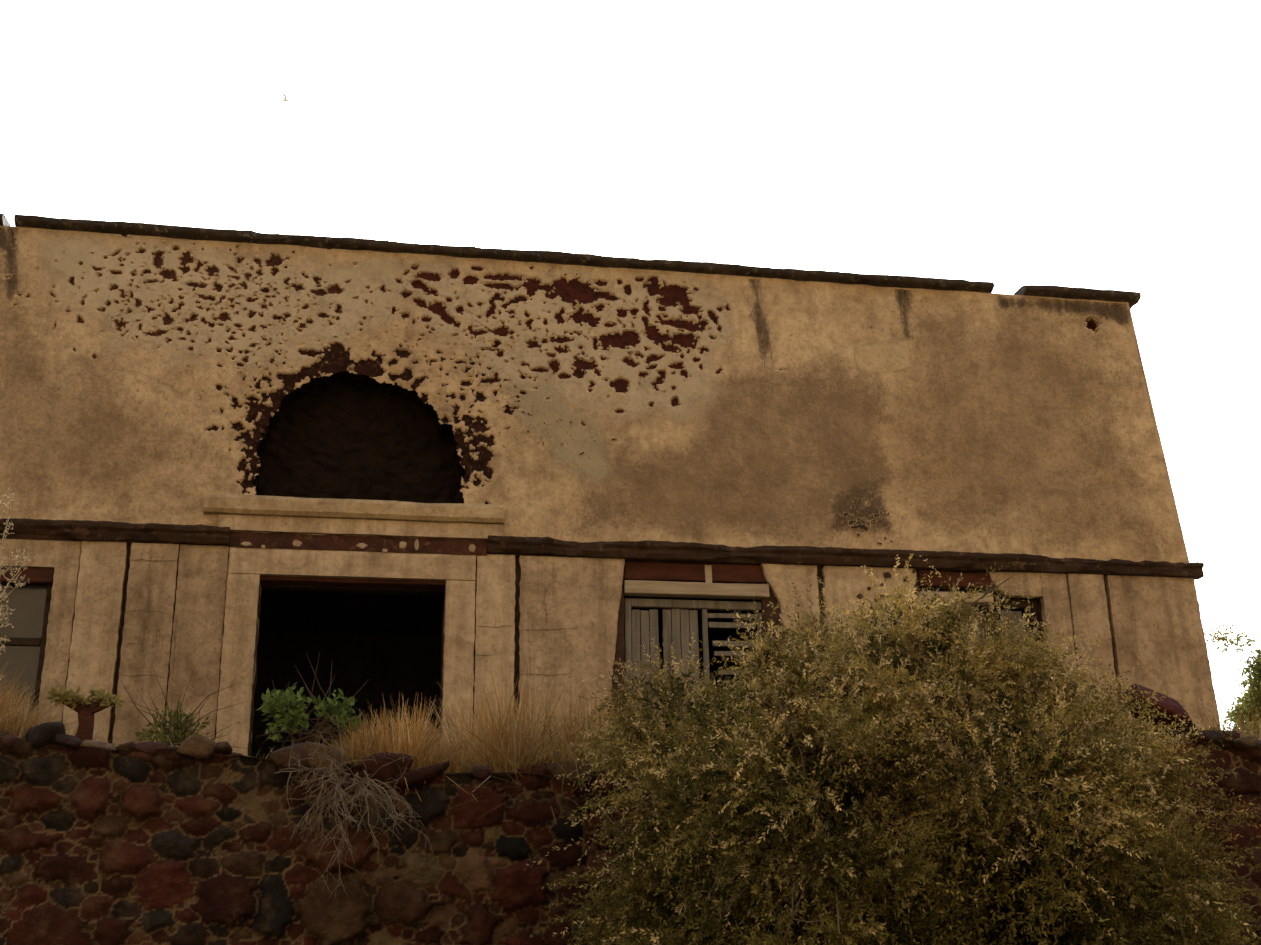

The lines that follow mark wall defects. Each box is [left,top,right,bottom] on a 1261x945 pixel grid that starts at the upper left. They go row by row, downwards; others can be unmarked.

leakage [0,227,17,293]
peeling [36,235,732,494]
leakage [754,305,768,350]
leakage [590,373,893,545]